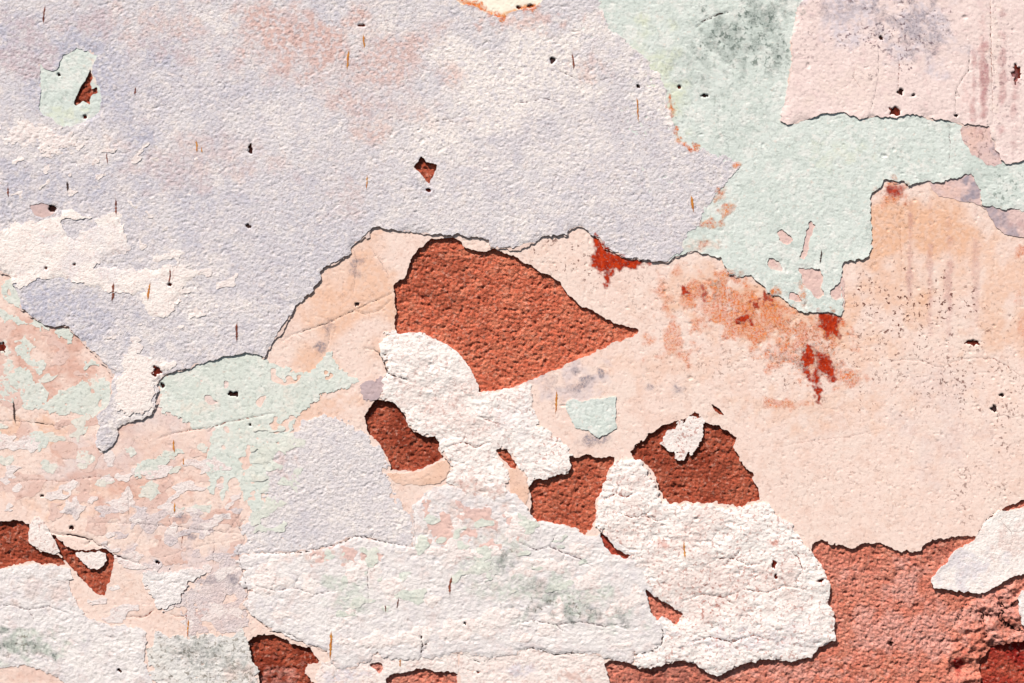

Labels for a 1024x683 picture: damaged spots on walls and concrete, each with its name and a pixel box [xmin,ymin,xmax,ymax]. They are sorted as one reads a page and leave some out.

flaking render [0,0,1024,474]
corrosion [591,233,650,287]
corrosion [682,271,854,403]
flaking render [0,351,1024,683]